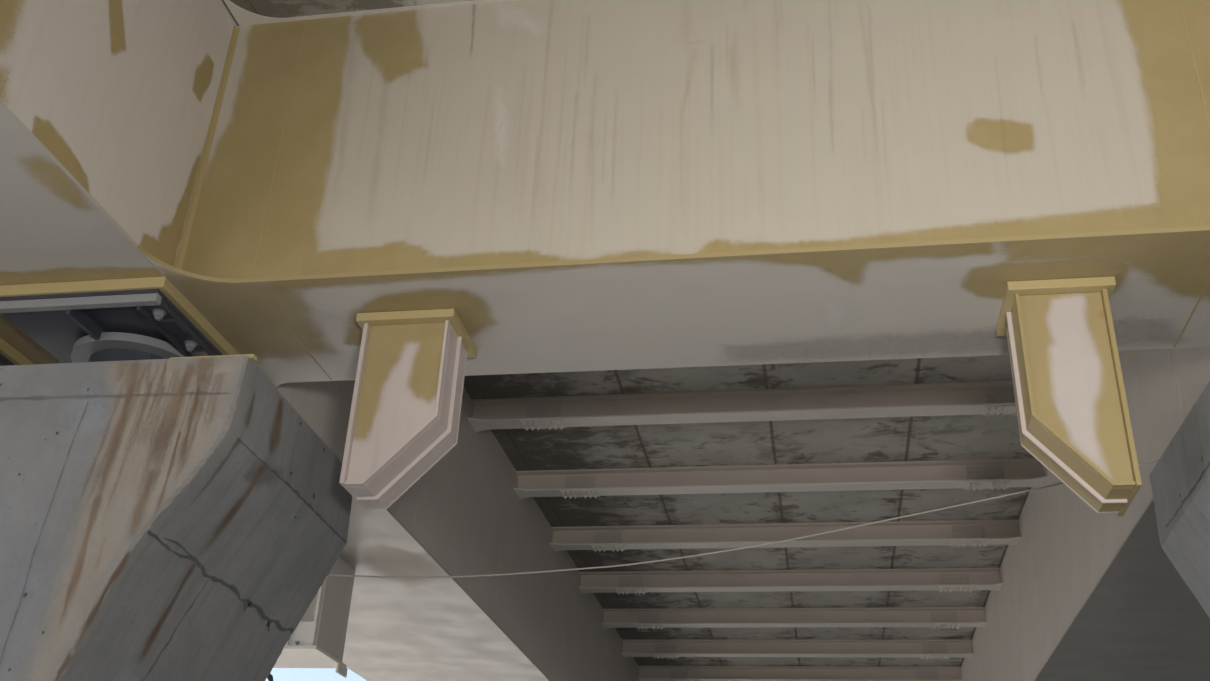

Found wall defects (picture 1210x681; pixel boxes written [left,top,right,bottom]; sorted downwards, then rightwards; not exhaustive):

rust [54,357,226,681]
rust [206,397,284,553]
crack [142,532,294,681]